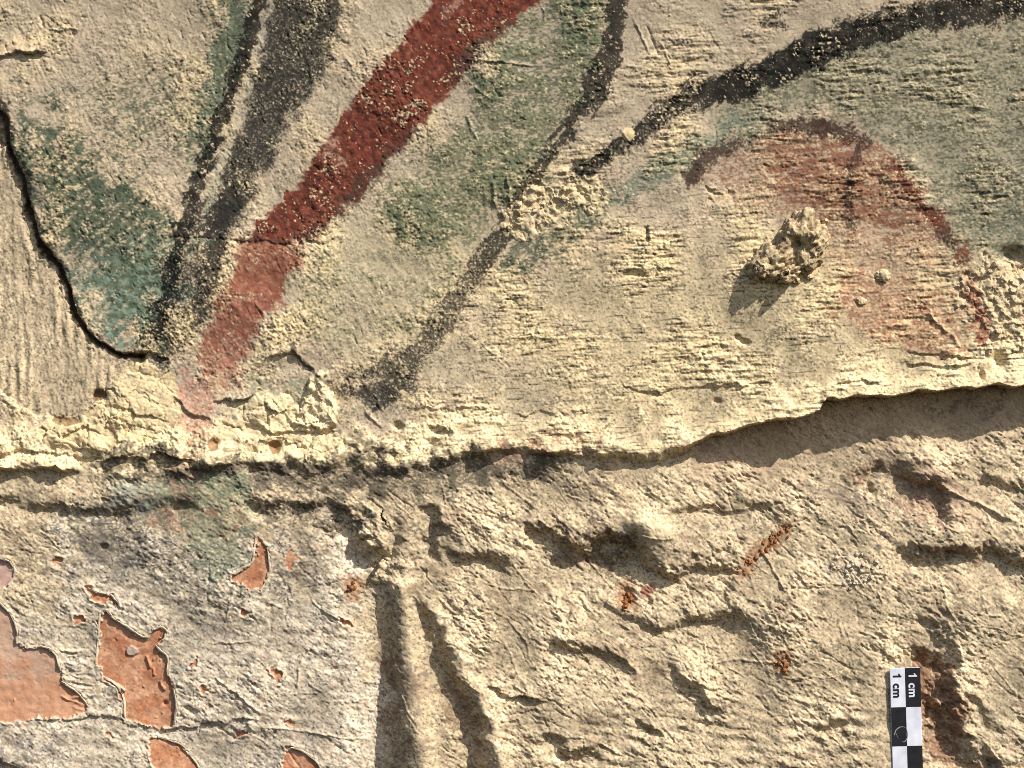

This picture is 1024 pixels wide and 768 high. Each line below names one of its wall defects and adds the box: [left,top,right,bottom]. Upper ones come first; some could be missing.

crack [0,109,151,361]
crack [596,382,794,398]
peeling [232,536,271,592]
corrosion [729,518,800,584]
peeling [0,602,89,724]
peeling [74,586,200,768]
peeling [282,746,321,768]